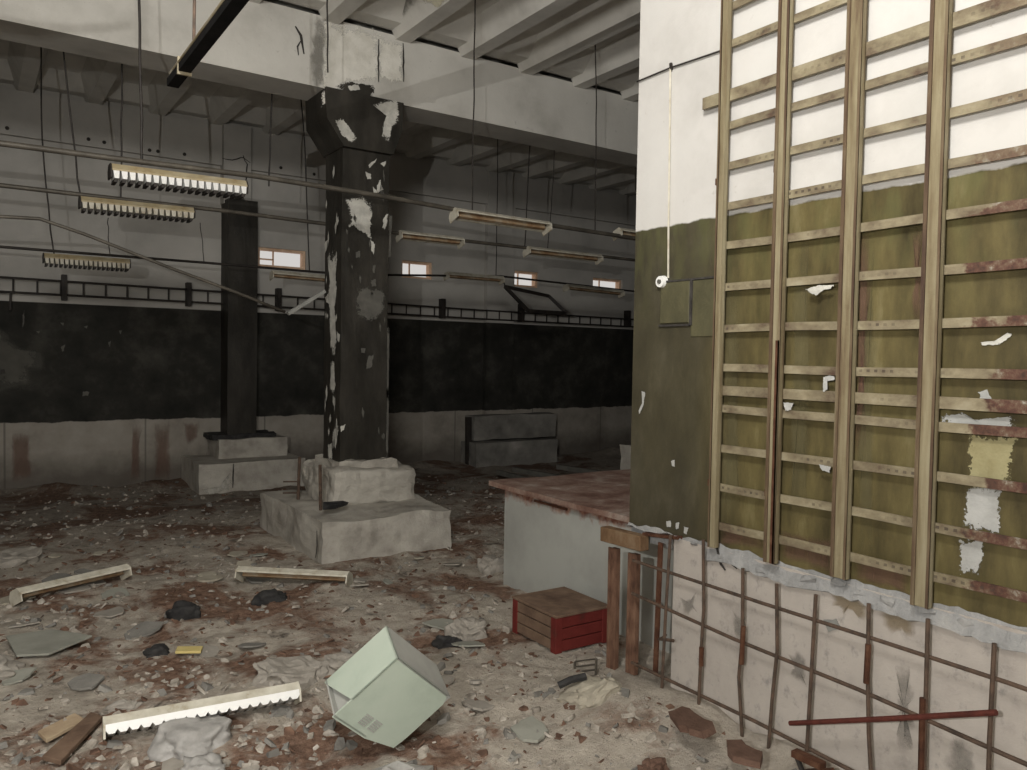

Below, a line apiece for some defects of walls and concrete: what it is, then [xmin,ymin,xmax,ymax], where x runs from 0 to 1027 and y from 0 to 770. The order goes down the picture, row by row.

peeling [318,160,392,511]
peeling [942,412,1018,575]
corrosion [642,532,683,673]